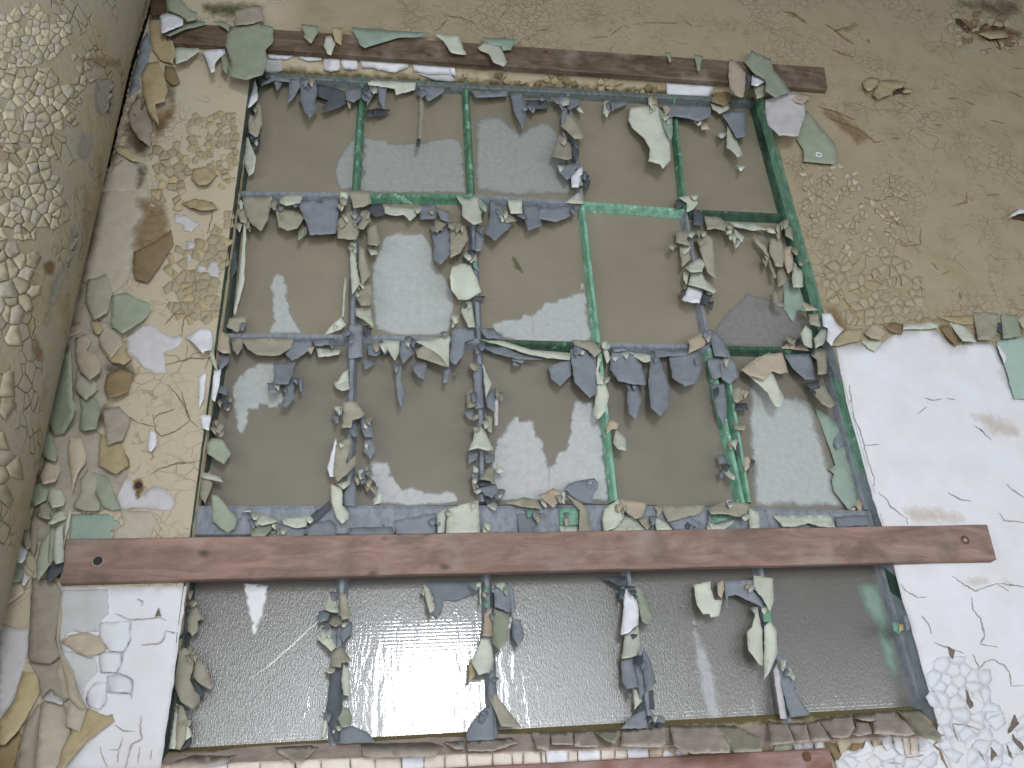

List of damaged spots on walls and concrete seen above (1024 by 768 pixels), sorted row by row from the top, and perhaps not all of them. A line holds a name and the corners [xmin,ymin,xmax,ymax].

crack [783,11,871,57]
peeling [945,11,1024,55]
peeling [597,50,812,171]
crack [818,106,899,143]
peeling [862,77,913,99]
crack [858,196,961,298]
flaking render [0,0,591,768]
flaking render [474,162,1024,768]
crack [849,385,908,524]
crack [999,483,1024,523]
crack [902,576,1024,687]
peeling [204,747,732,768]